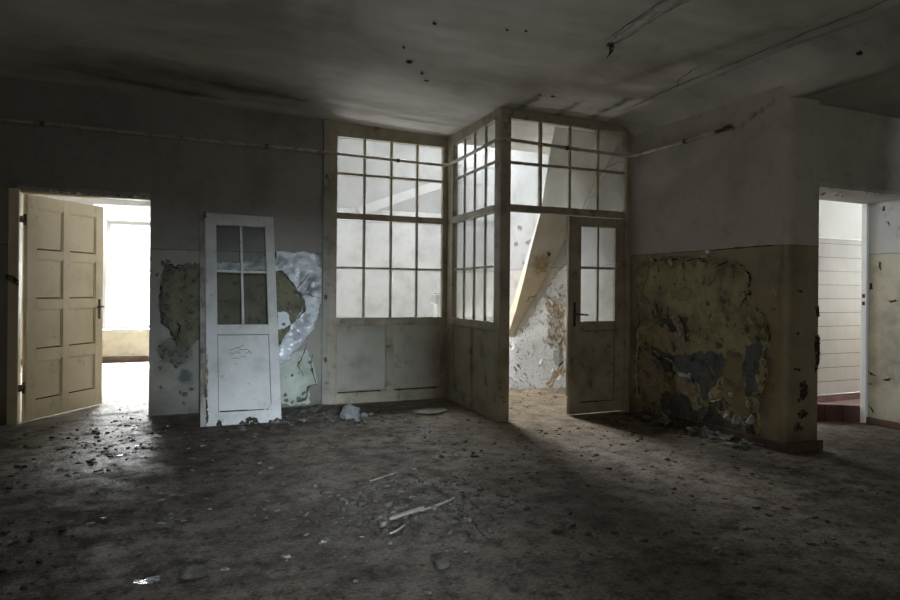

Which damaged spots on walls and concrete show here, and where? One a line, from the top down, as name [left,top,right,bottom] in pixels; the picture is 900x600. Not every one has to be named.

peeling [145,259,200,370]
peeling [279,349,318,406]
peeling [509,264,567,390]
peeling [633,250,777,436]